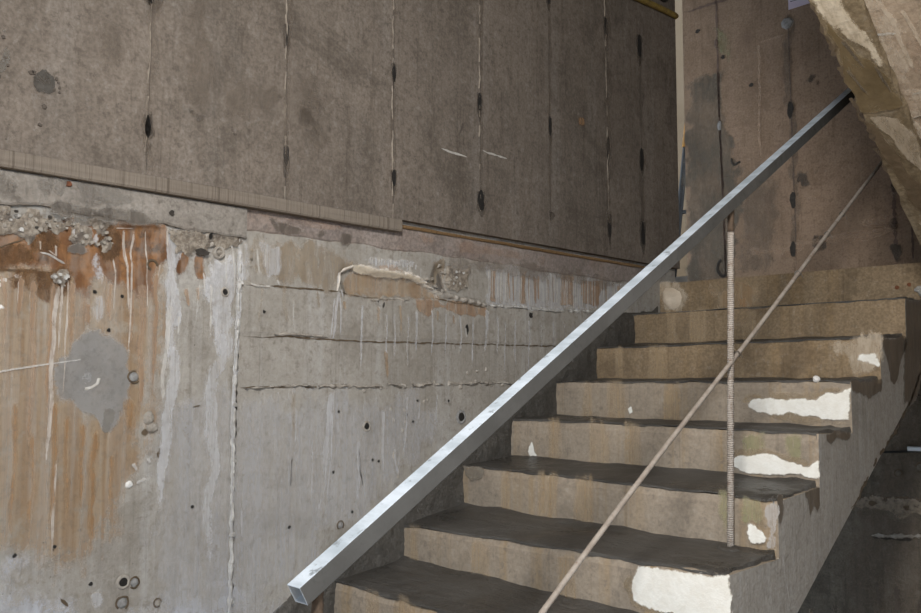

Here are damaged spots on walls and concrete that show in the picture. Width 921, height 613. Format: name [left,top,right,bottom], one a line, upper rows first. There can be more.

spalling [0,205,113,254]
damp [50,200,162,226]
spalling [169,229,243,259]
spalling [0,252,70,287]
spalling [424,259,471,293]
damp [161,240,181,394]
damp [196,250,236,354]
corrosion [0,218,205,571]
crack [227,239,244,613]
spalling [851,476,921,519]